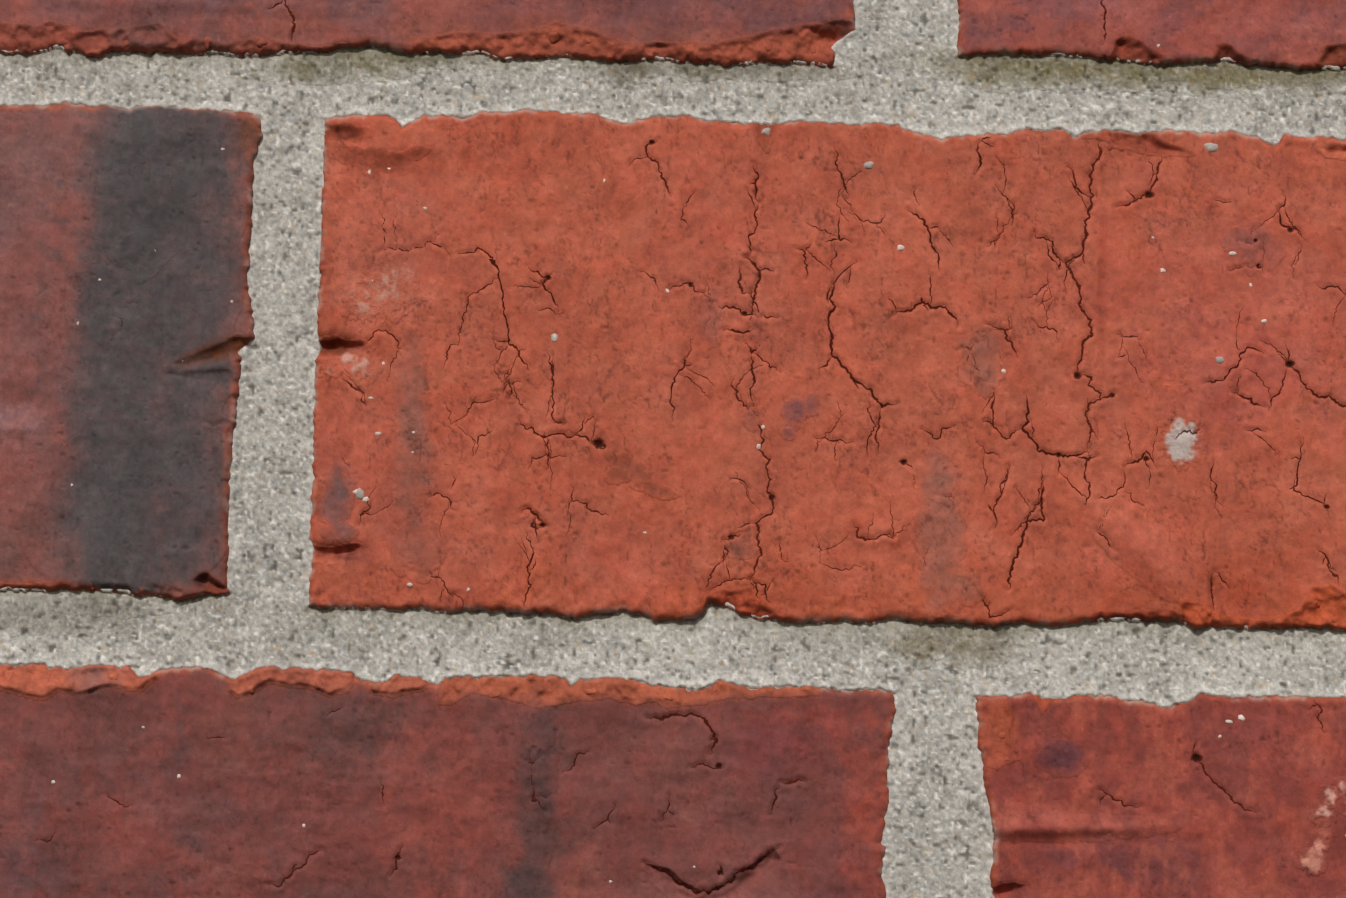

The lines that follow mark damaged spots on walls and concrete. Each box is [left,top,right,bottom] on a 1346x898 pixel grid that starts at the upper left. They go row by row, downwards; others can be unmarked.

crack [630,139,694,229]
crack [1228,195,1346,327]
crack [342,329,402,405]
crack [370,209,609,608]
crack [640,166,786,604]
crack [795,137,1223,618]
crack [1204,307,1346,512]
crack [343,459,392,526]
crack [1210,571,1229,618]
crack [1316,547,1340,587]
crack [644,847,779,895]
water stain [1295,774,1346,877]